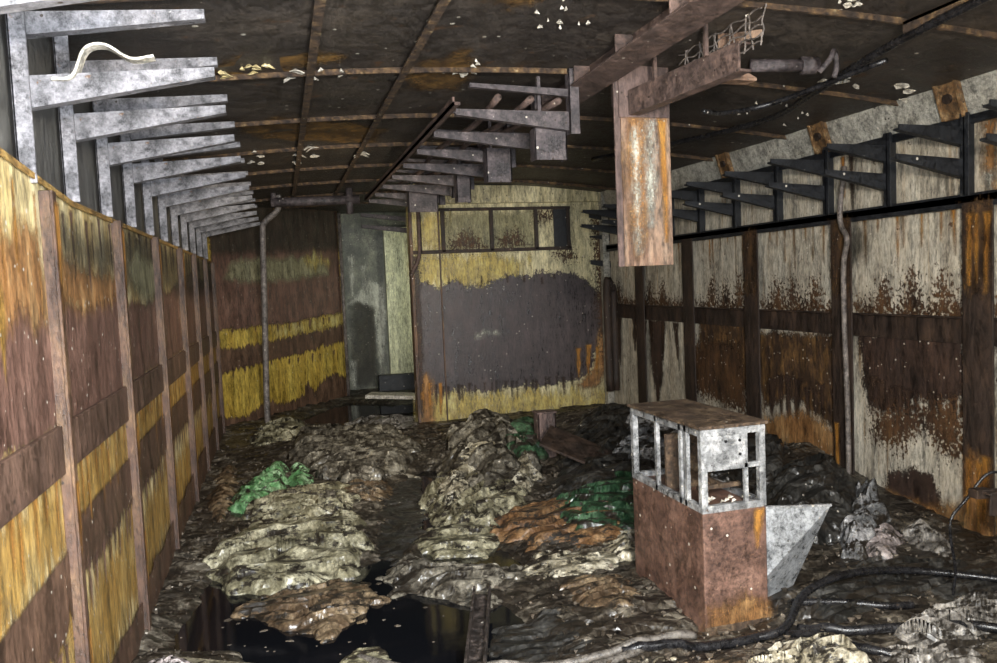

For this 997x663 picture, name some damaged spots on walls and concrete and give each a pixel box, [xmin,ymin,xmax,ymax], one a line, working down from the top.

rust [0,178,57,460]
rust [54,204,342,416]
rust [407,209,605,422]
water stain [413,269,602,404]
rust [708,596,771,627]
rust [754,510,763,544]
rust [615,118,997,318]
rust [856,336,997,536]